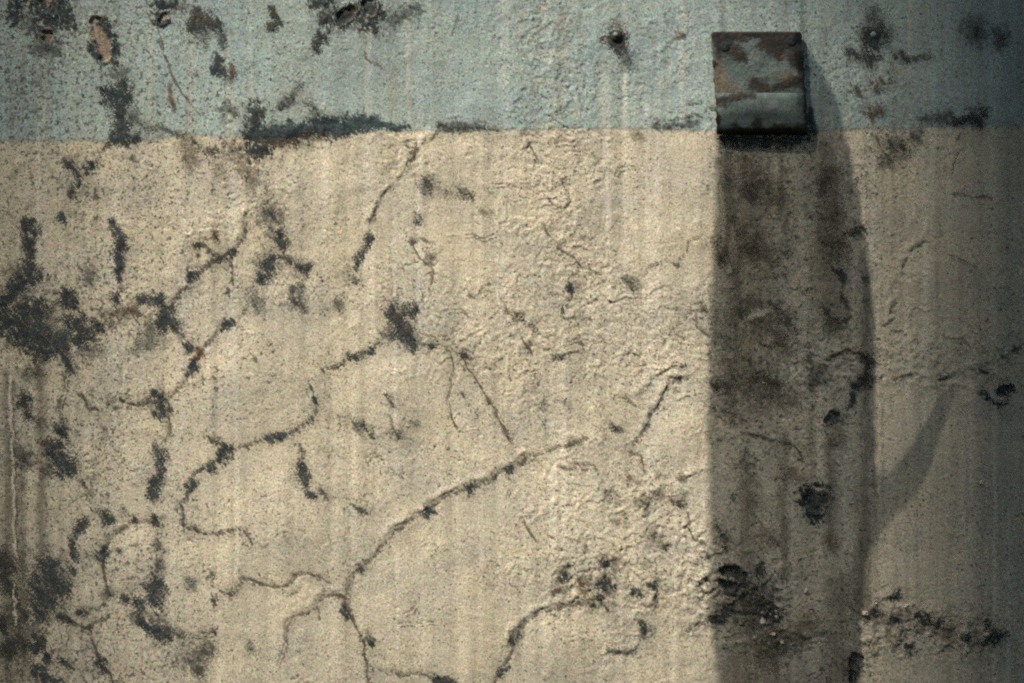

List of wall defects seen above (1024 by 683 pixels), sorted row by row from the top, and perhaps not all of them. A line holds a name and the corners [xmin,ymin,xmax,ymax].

mould [181,5,236,82]
mould [266,2,283,31]
mould [310,29,329,53]
mould [98,66,250,161]
mould [277,84,302,109]
corrosion [851,76,887,119]
crack [62,143,109,198]
crack [58,227,247,441]
leakage [0,197,128,683]
crack [211,223,689,683]
crack [45,343,379,683]
crack [668,489,704,543]